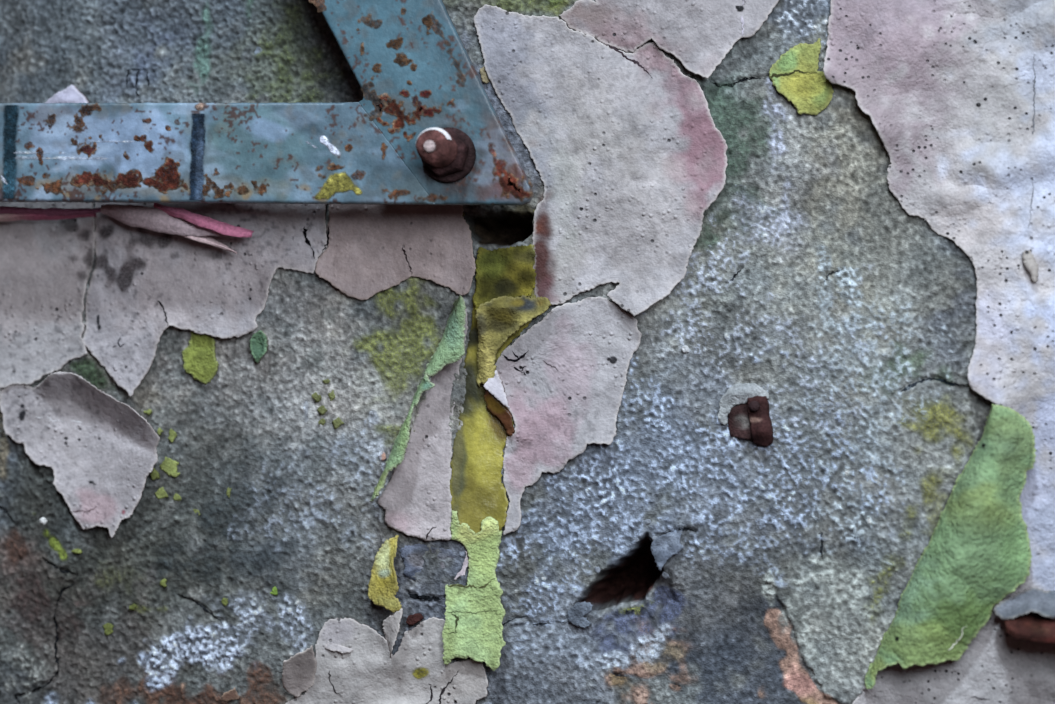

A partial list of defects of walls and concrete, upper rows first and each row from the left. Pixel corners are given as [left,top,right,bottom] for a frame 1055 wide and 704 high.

corrosion [70,103,102,157]
corrosion [19,142,188,195]
corrosion [134,118,153,152]
corrosion [202,168,269,199]
corrosion [361,37,454,159]
corrosion [489,143,533,201]
crack [303,227,330,258]
peeling [0,0,779,704]
peeling [823,0,1055,704]
crack [14,558,78,703]
efflorescence [138,596,311,690]
spalling [764,609,838,704]